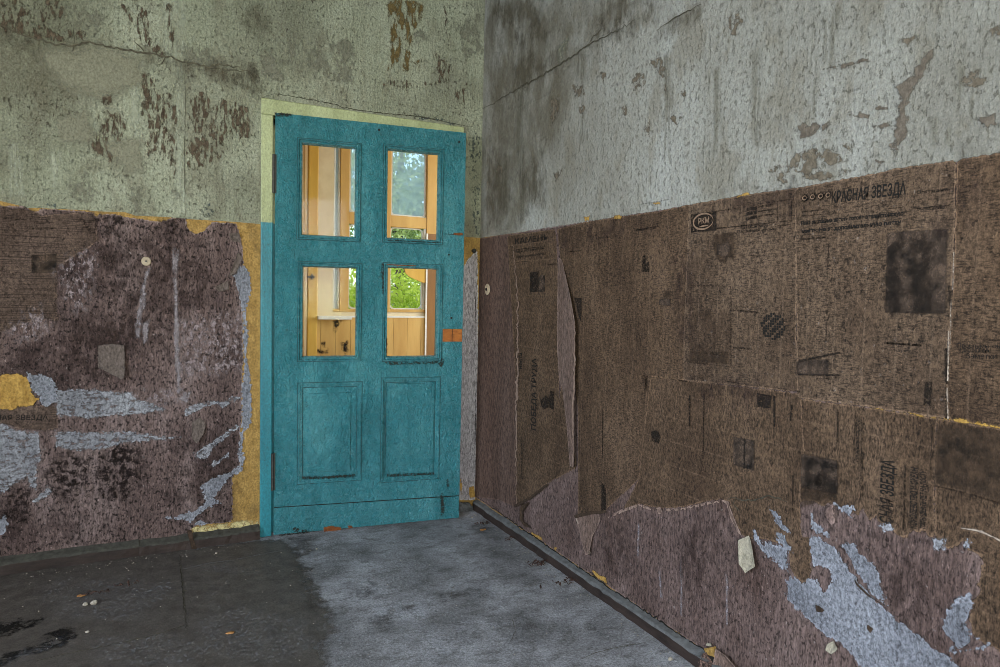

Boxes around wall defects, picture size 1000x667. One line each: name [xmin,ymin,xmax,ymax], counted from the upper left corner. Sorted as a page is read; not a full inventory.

peeling [88,95,126,162]
peeling [141,73,250,196]
crack [0,19,635,188]
peeling [769,143,853,186]
peeling [798,121,830,138]
peeling [849,49,934,151]
peeling [0,371,165,419]
peeling [165,233,258,532]
peeling [0,423,52,502]
peeling [55,431,173,452]
peeling [833,501,856,518]
peeling [753,510,991,667]